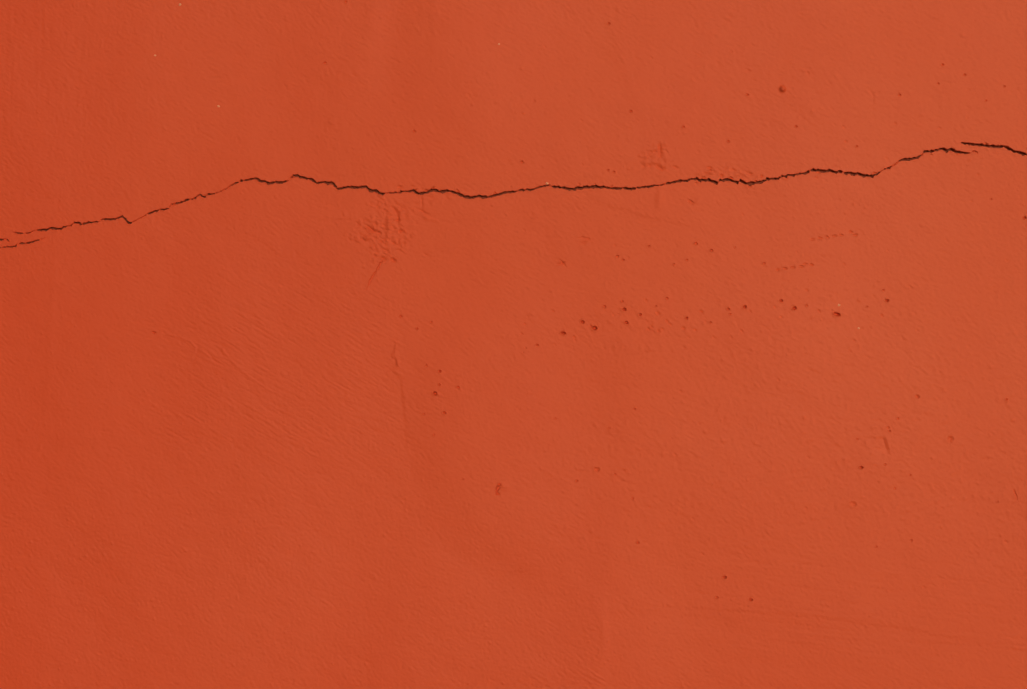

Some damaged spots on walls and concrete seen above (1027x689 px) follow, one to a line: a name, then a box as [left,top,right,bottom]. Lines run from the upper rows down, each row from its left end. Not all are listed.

crack [0,139,1027,251]